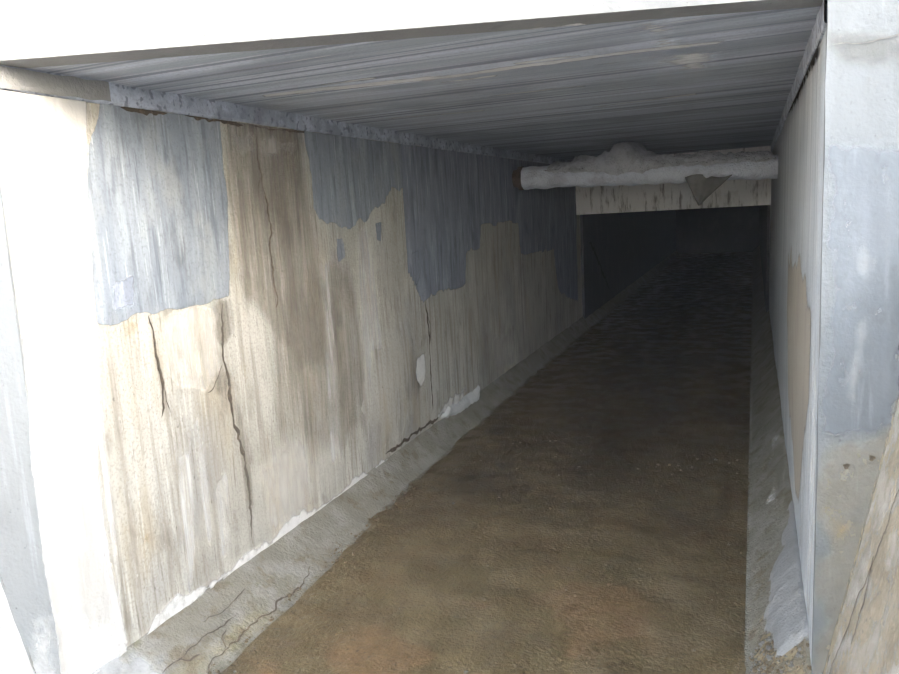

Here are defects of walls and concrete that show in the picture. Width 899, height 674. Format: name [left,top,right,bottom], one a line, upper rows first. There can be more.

peeling [87,104,230,325]
peeling [304,131,578,302]
crack [148,316,171,416]
crack [208,304,252,537]
crack [386,303,439,454]
peeling [787,250,811,499]
crack [162,565,313,674]
water stain [148,473,367,634]